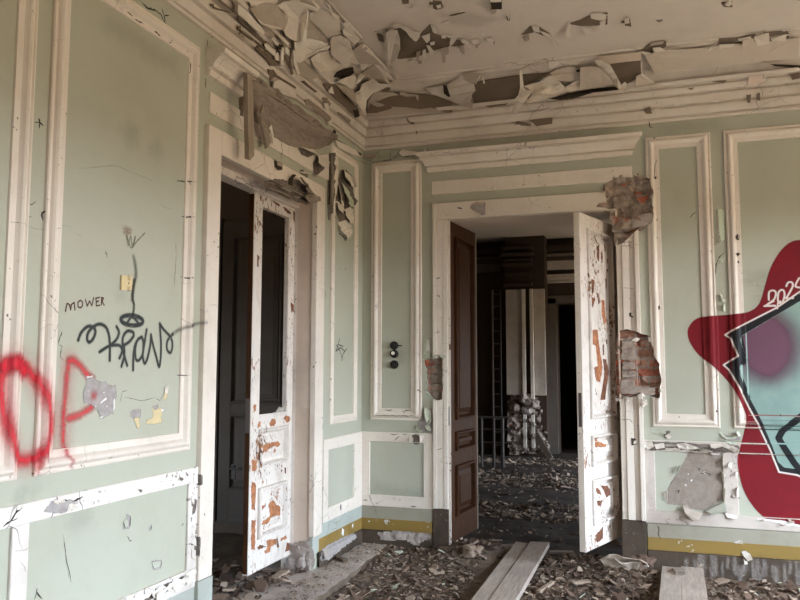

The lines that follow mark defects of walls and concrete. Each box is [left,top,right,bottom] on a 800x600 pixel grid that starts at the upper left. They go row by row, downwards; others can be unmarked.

peeling [243,0,800,118]
peeling [530,117,553,126]
peeling [261,147,358,241]
spalling [596,173,657,246]
spalling [83,375,117,419]
spalling [130,386,169,428]
spalling [408,338,447,445]
spalling [615,329,665,407]
peeling [44,496,83,513]
spalling [320,524,357,561]
spalling [378,520,431,546]
spalling [631,430,740,521]